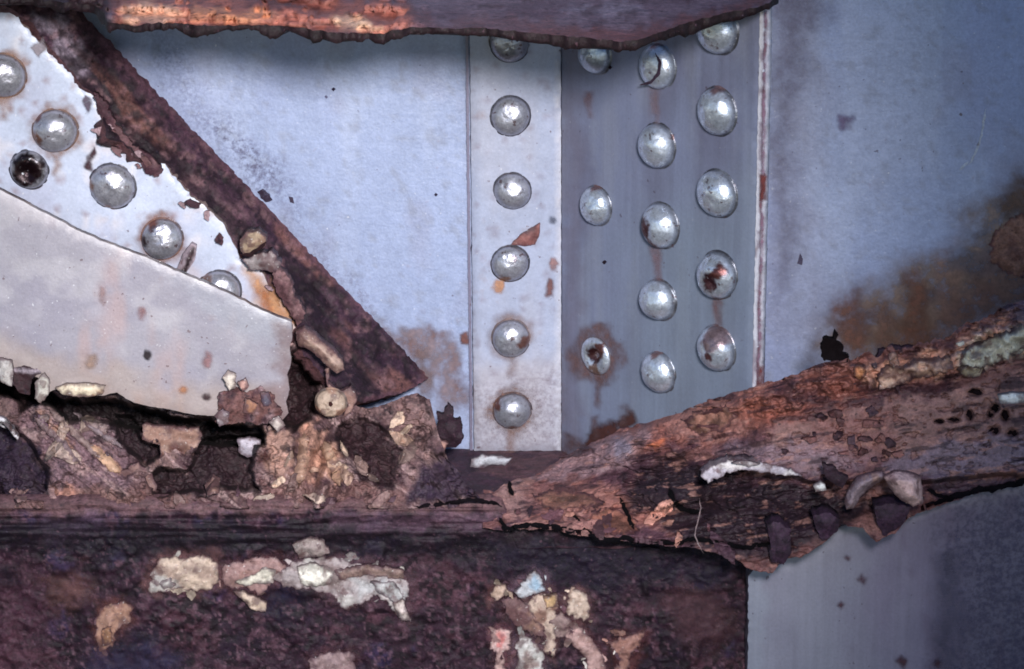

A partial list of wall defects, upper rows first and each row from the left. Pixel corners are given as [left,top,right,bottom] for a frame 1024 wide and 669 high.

corrosion [83,91,163,177]
corrosion [240,226,358,417]
peeling [33,372,123,473]
corrosion [203,369,285,432]
peeling [237,436,261,457]
peeling [252,433,397,509]
peeling [700,448,802,483]
crack [414,481,770,550]
peeling [142,535,413,622]
corrosion [93,598,135,656]
corrosion [308,648,357,669]
corrosion [501,586,648,669]